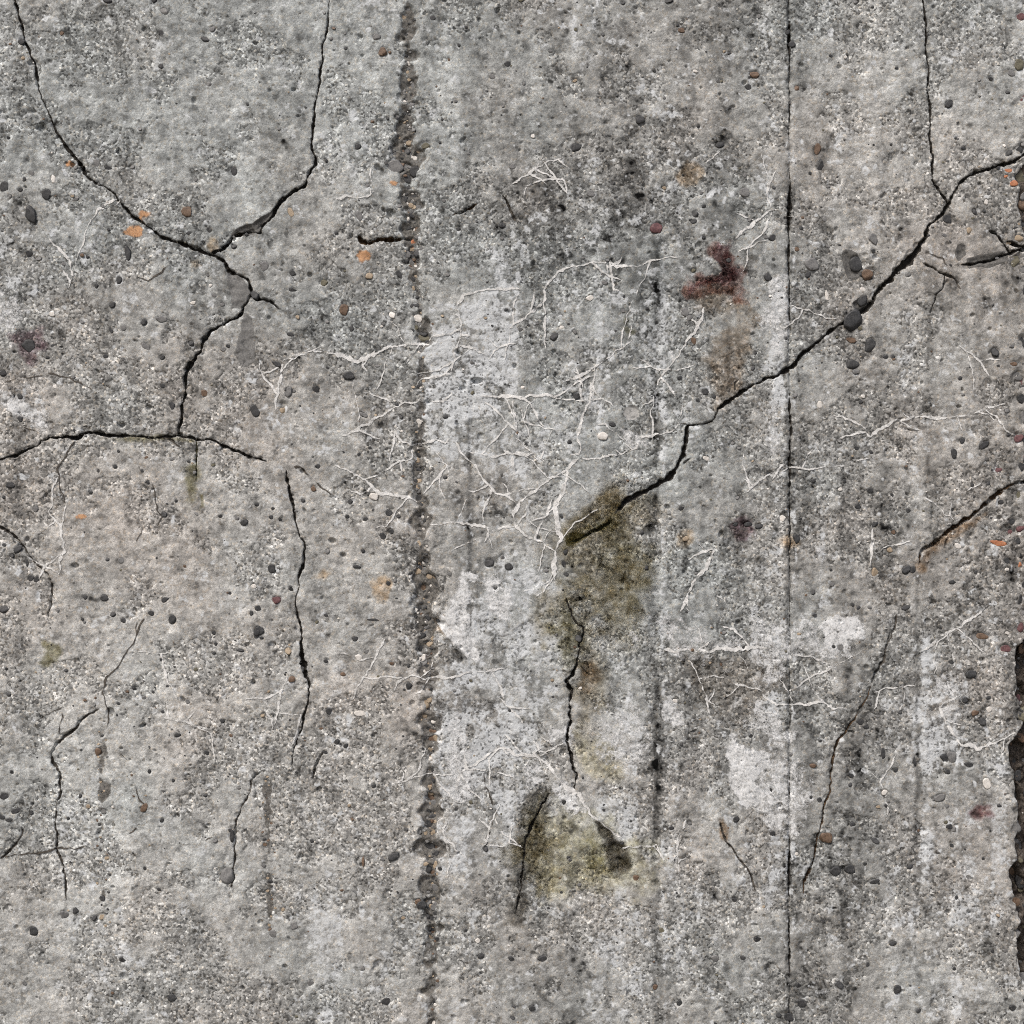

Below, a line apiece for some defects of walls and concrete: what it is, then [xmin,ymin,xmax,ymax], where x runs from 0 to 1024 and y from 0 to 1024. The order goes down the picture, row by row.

efflorescence [755,270,789,357]
crack [570,0,1024,542]
crack [0,0,332,778]
damp [623,430,647,448]
crack [919,483,1014,563]
crack [1,619,144,898]
damp [524,763,587,815]
damp [548,726,574,745]
crack [565,598,585,789]
crack [803,614,897,893]
crack [516,794,549,909]
flaking render [1009,823,1024,906]